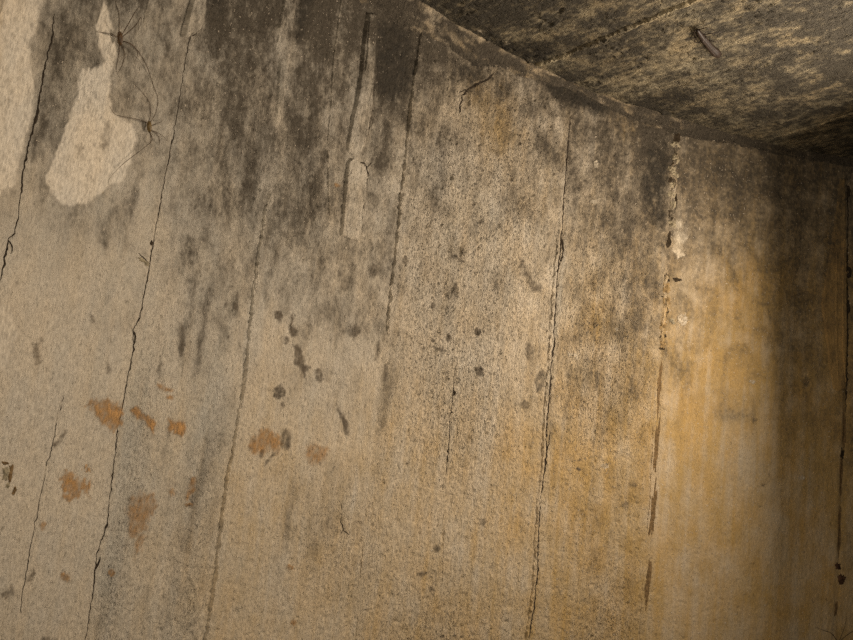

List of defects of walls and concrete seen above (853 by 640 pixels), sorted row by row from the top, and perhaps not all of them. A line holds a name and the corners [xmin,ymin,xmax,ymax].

crack [0,14,55,280]
rust [90,399,156,433]
crack [85,30,199,639]
damp [275,311,322,381]
crack [529,116,571,637]